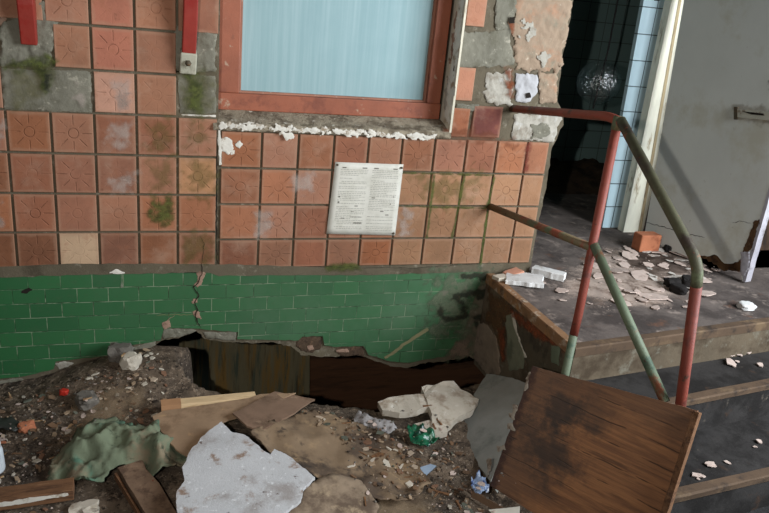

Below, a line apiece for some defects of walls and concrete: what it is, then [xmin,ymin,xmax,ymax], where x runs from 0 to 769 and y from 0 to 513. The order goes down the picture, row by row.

spalling [174,26,437,165]
spalling [444,0,572,142]
crack [162,131,218,329]
crack [384,328,429,359]
damp [438,273,488,327]